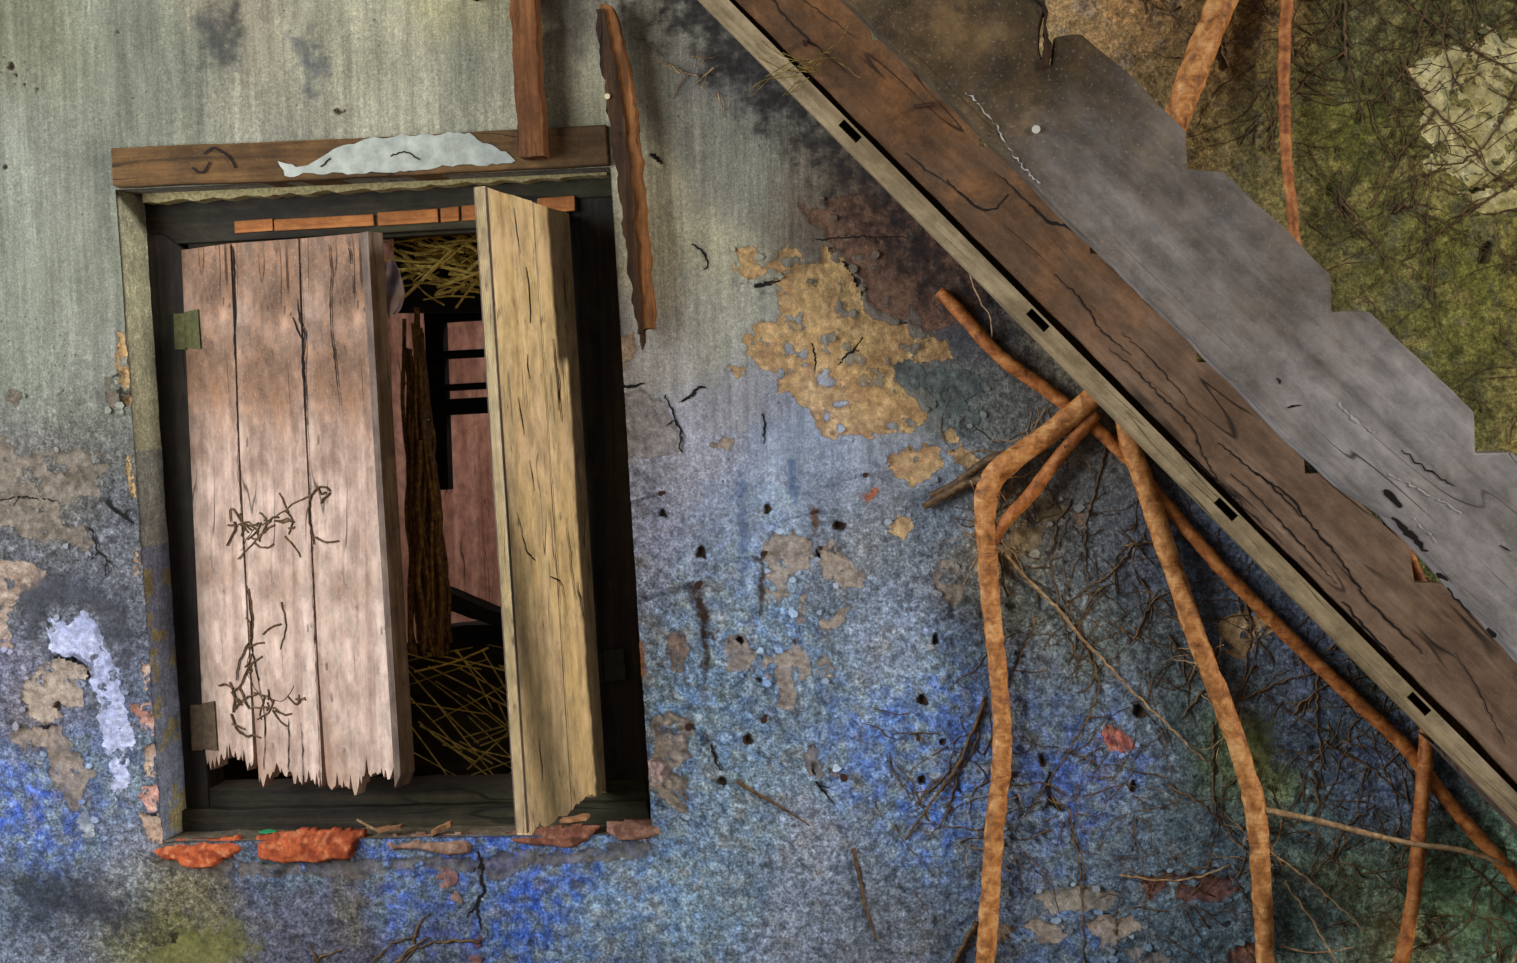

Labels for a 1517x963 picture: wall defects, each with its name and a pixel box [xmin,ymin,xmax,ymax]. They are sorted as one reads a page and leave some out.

flaking render [104,332,132,414]
flaking render [726,189,988,487]
flaking render [0,560,47,654]
flaking render [667,631,693,682]
flaking render [723,504,868,714]
flaking render [8,657,99,839]
flaking render [121,663,660,905]
flaking render [648,710,695,820]
flaking render [804,745,842,779]
crack [467,851,486,929]